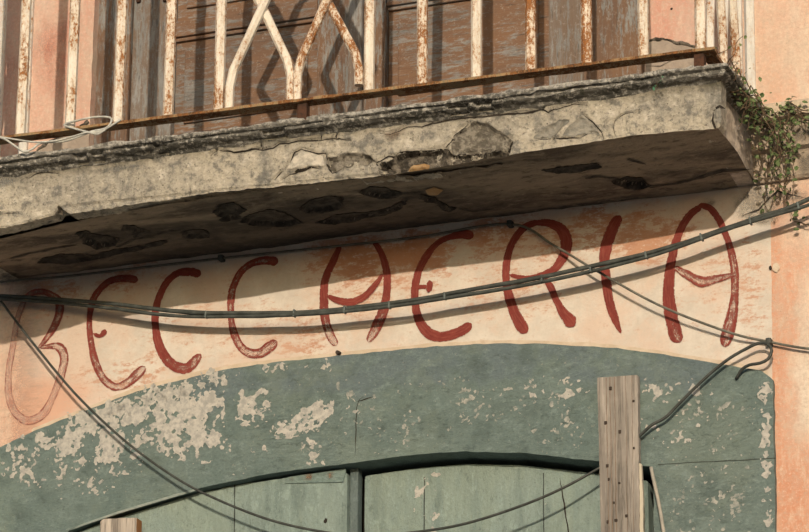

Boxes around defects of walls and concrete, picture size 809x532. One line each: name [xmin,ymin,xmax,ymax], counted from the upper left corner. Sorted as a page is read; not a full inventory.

spalling [645,37,695,72]
spalling [36,120,90,152]
spalling [287,121,512,177]
spalling [534,115,602,139]
spalling [541,163,602,174]
spalling [212,186,456,227]
peeling [1,367,231,496]
peeling [235,379,421,465]
crack [355,396,371,452]
peeling [454,376,590,449]
peeling [640,377,773,531]